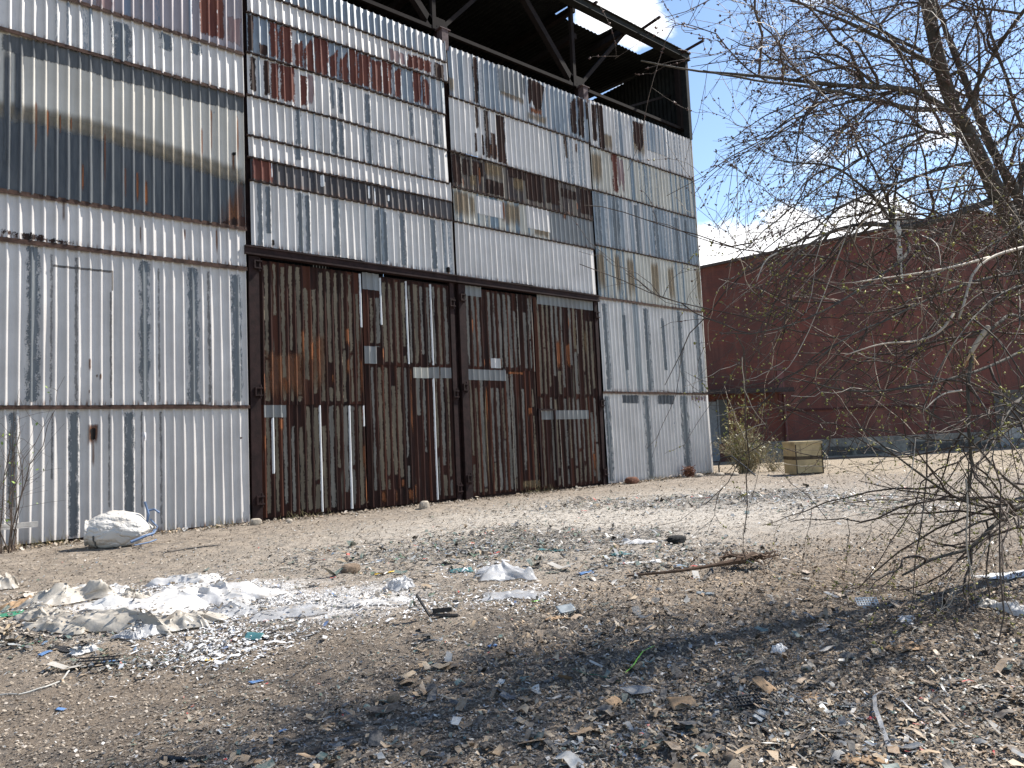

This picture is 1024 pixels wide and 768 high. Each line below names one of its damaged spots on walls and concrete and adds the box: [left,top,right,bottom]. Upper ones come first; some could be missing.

rust [199,0,454,106]
rust [251,159,274,182]
rust [451,57,593,222]
peeling [7,413,17,507]
peeling [24,246,53,479]
peeling [68,258,80,538]
peeling [124,260,163,523]
peeling [185,267,212,403]
peeling [230,274,244,402]
rust [264,331,334,395]
peeling [466,292,705,493]